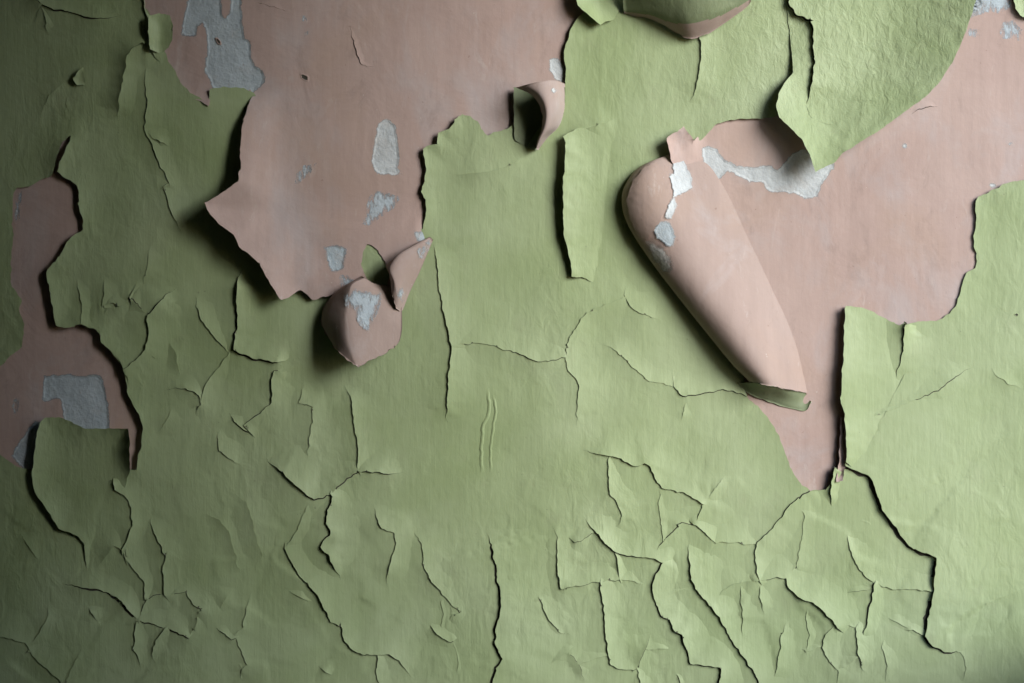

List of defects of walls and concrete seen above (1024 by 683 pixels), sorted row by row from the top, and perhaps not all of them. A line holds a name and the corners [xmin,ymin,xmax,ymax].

crack [0,608,96,683]
peeling [0,136,143,571]
peeling [145,0,620,300]
crack [62,242,1024,683]
peeling [667,0,1024,491]